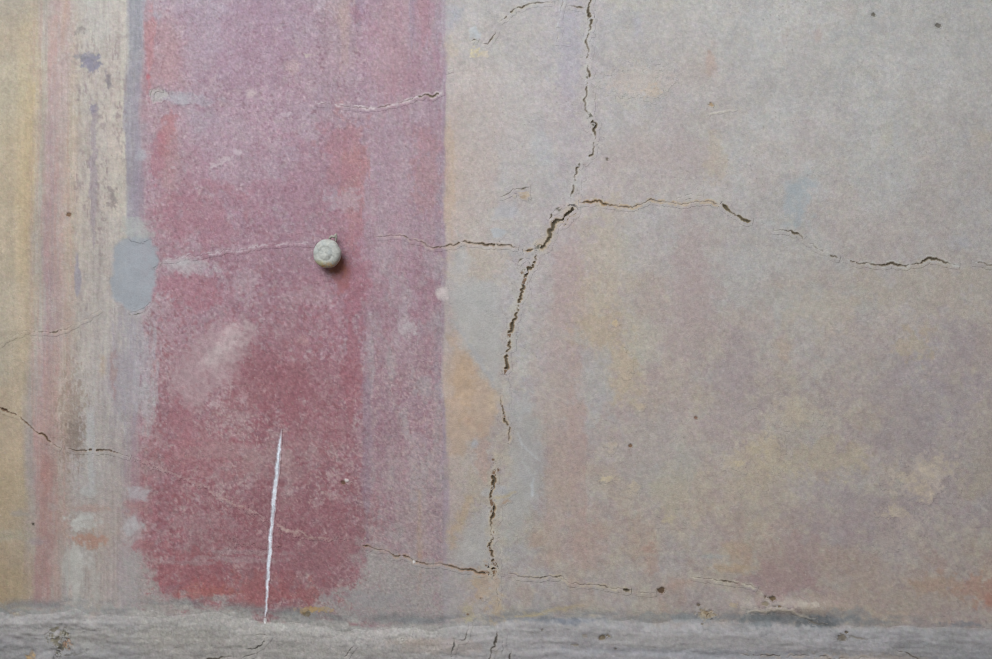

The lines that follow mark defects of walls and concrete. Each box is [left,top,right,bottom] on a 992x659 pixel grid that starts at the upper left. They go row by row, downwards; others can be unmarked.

crack [314,65,454,112]
crack [163,239,317,264]
crack [360,0,992,659]
crack [0,404,132,461]
crack [196,630,273,659]